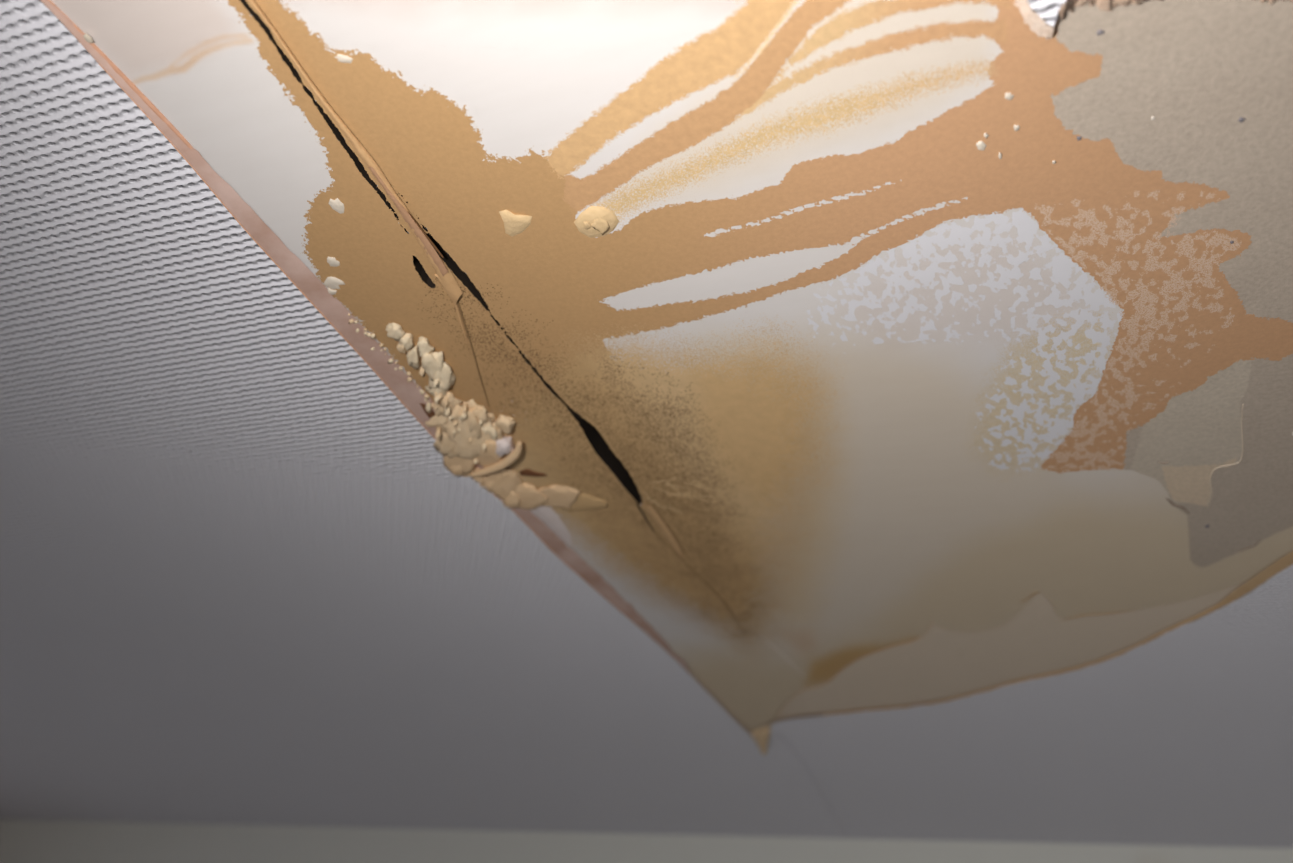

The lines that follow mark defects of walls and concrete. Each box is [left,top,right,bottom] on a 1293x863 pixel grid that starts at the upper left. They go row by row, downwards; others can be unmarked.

spalling [348,314,608,548]
crack [239,0,759,637]
water stain [228,0,1293,663]